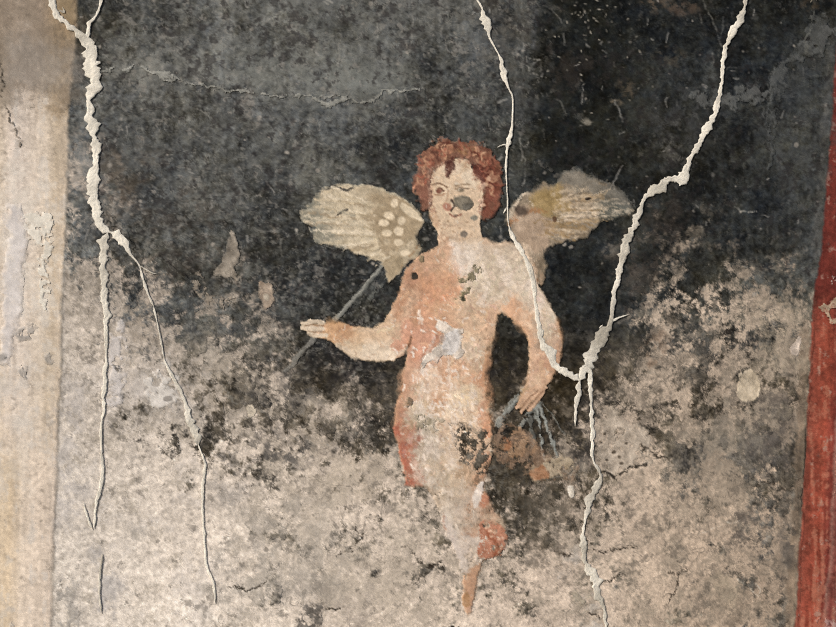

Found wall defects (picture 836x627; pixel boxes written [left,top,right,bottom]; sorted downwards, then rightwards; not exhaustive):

crack [6,108,21,147]
crack [48,0,265,602]
crack [476,0,748,627]
water stain [102,317,128,408]
water stain [143,353,187,410]
peeling [46,207,836,627]
water stain [54,576,84,627]
crack [96,553,104,611]